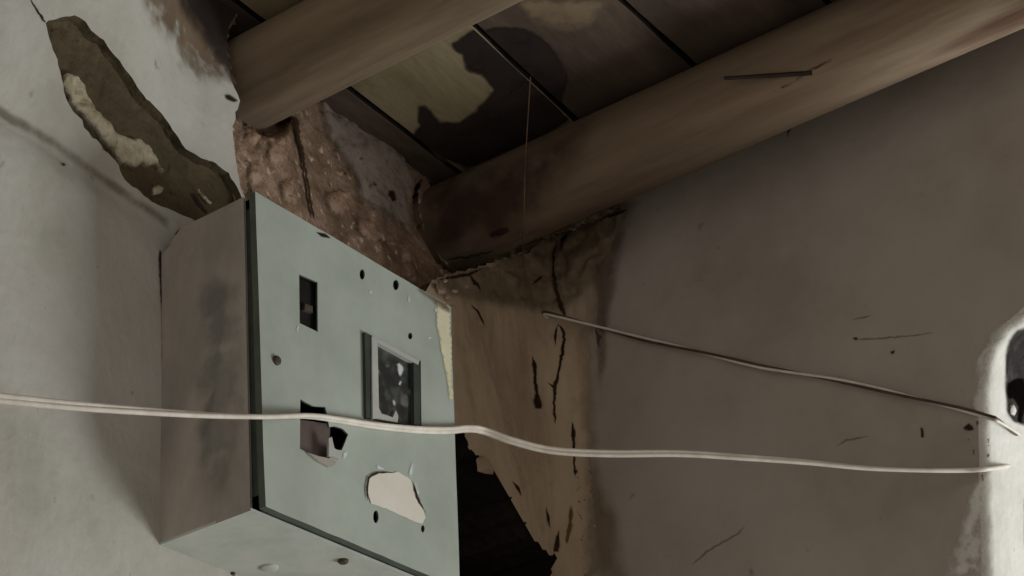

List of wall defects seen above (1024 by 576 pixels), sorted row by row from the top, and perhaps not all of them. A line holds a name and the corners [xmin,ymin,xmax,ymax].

spalling [46,20,253,221]
crack [275,116,314,218]
crack [532,240,577,476]
spalling [476,455,494,474]
spalling [546,507,560,552]